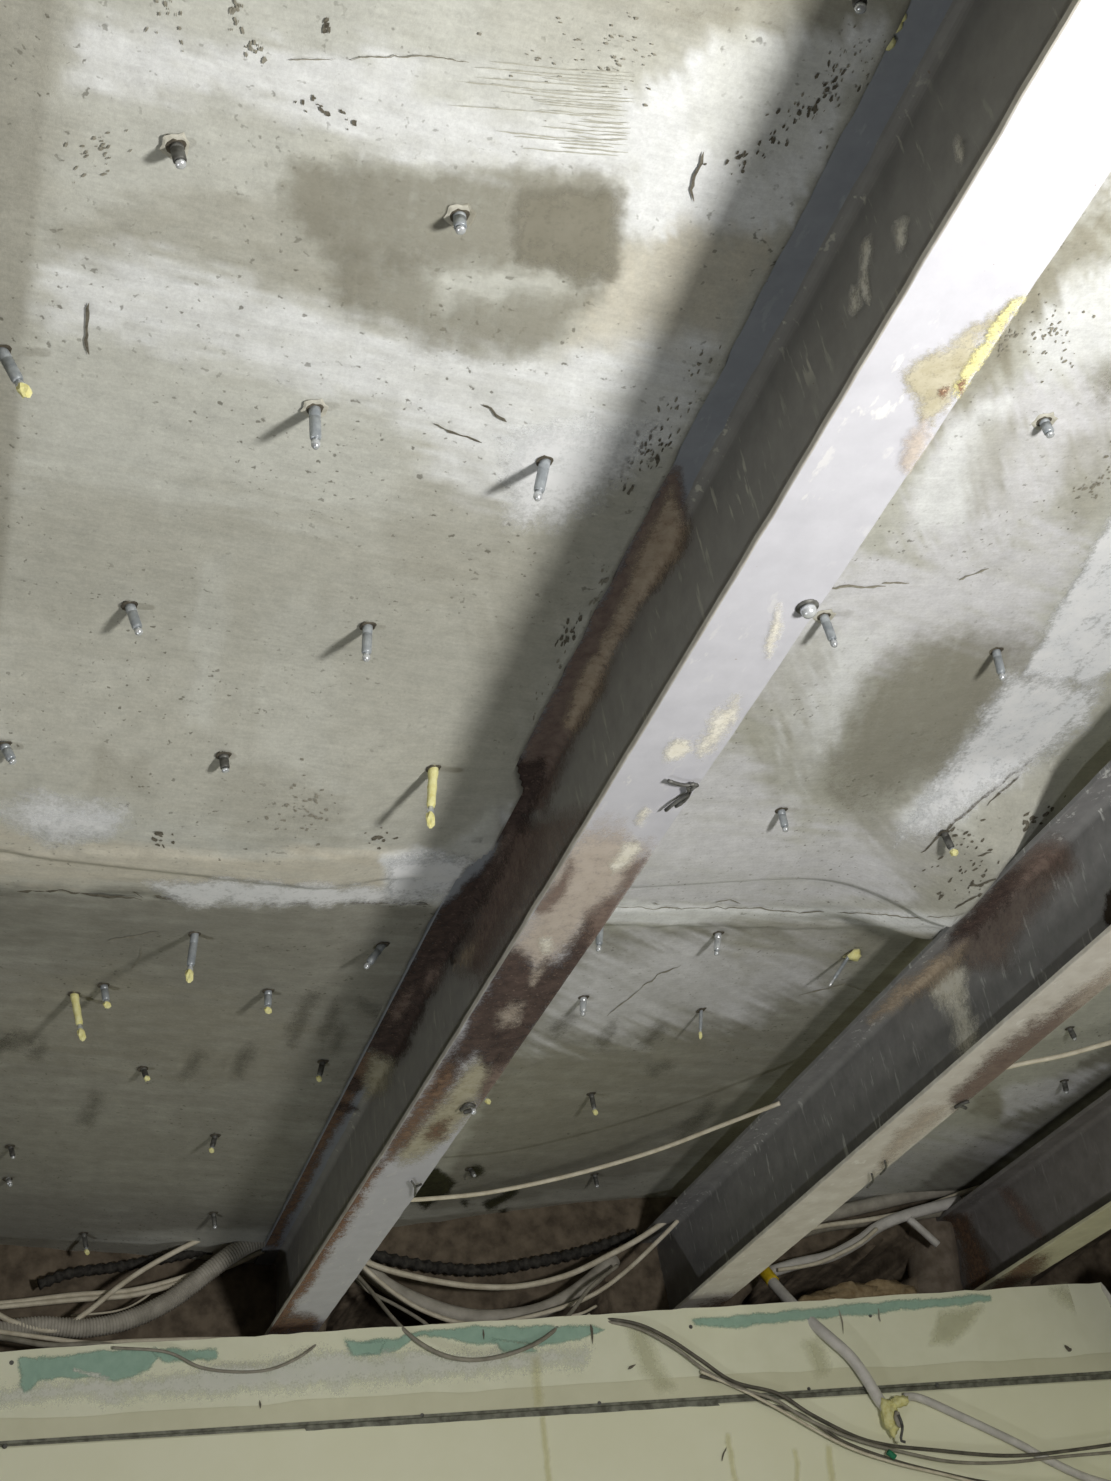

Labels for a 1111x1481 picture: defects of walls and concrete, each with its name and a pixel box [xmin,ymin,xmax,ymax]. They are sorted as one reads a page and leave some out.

rust [266,469,687,1335]